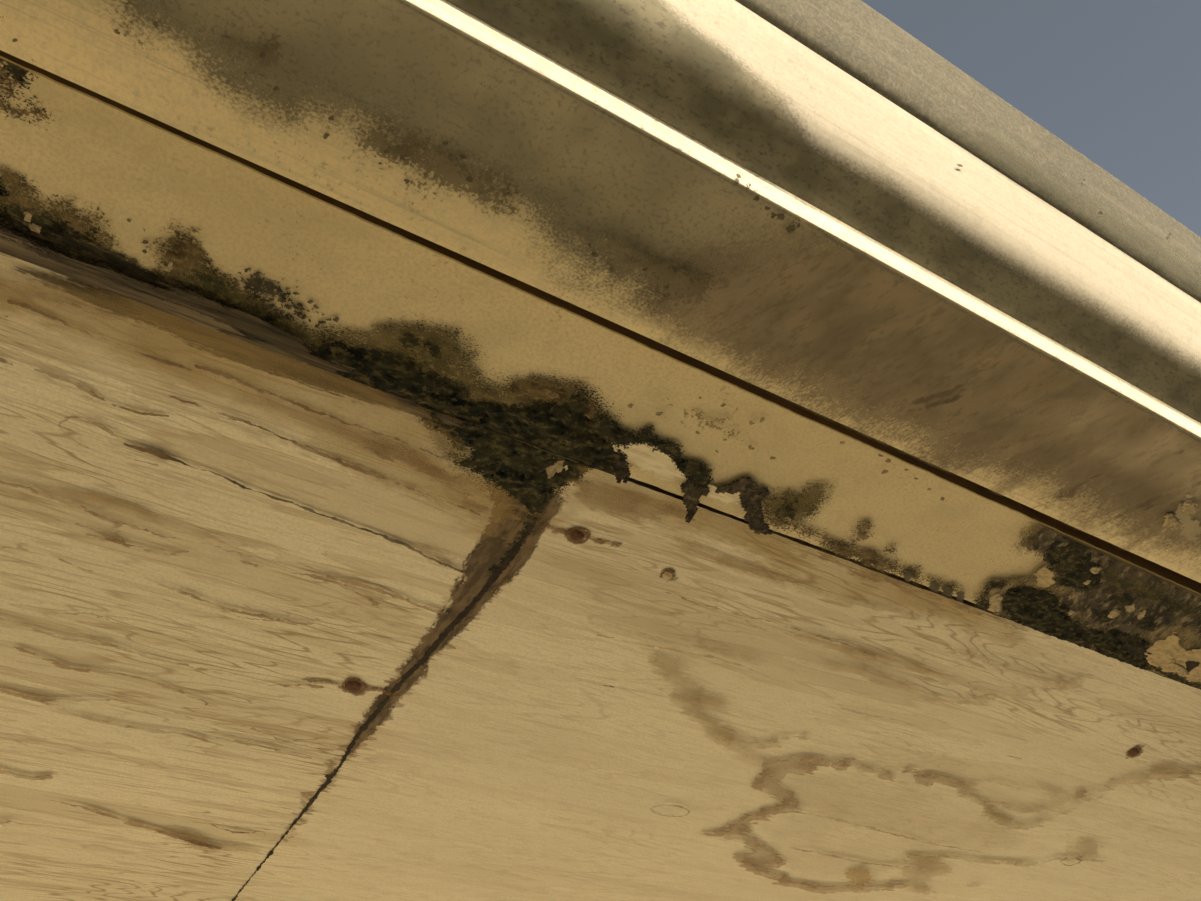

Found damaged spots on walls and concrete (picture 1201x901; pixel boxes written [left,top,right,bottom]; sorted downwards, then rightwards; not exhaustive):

water stain [0,58,55,124]
crack [141,353,251,386]
water stain [0,165,633,514]
rust [534,520,621,547]
water stain [757,482,1201,690]
crack [15,619,202,729]
crack [62,383,564,901]
rust [303,677,399,697]
peeling [1134,632,1201,682]
rust [1126,745,1145,759]
crack [0,770,158,832]
water stain [702,795,906,894]